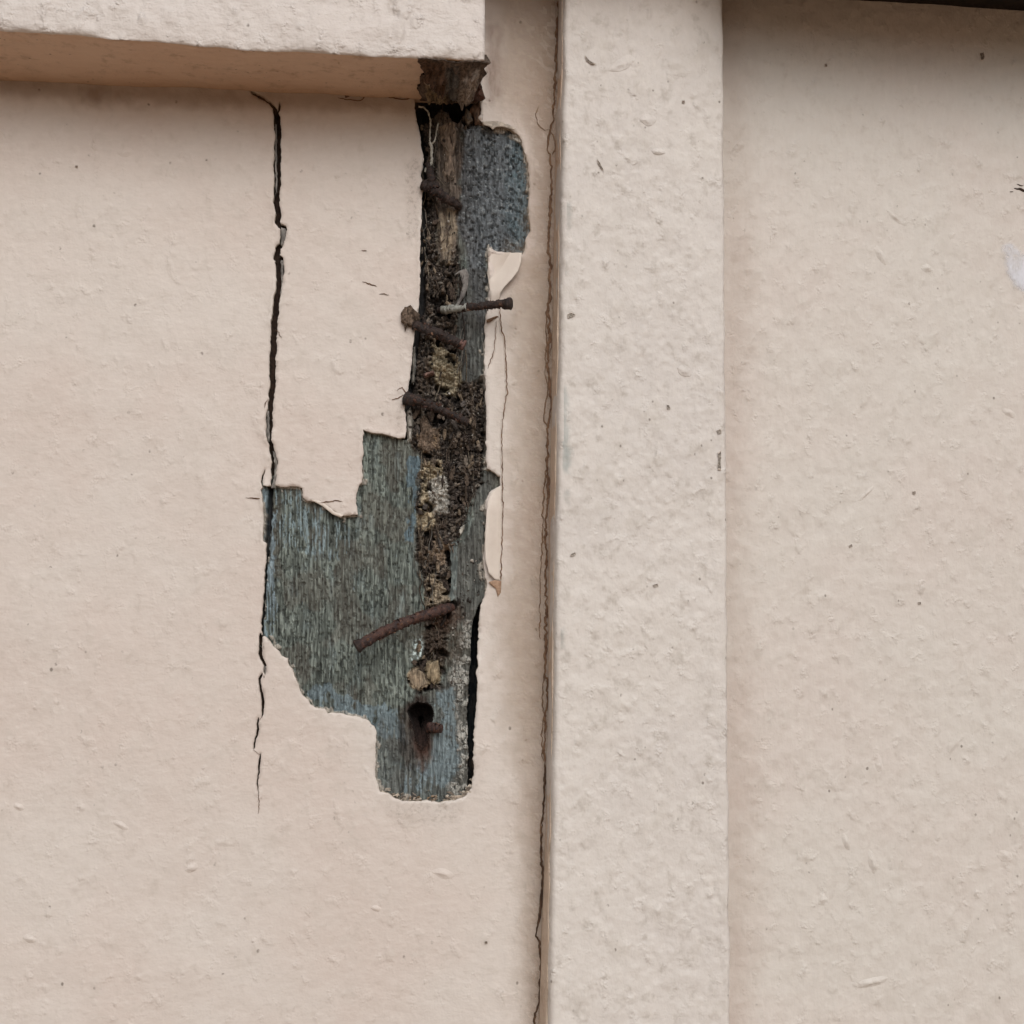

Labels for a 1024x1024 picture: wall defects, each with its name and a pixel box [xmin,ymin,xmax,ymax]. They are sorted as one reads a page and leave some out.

crack [246,94,287,499]
peeling [261,102,530,802]
crack [254,633,267,813]